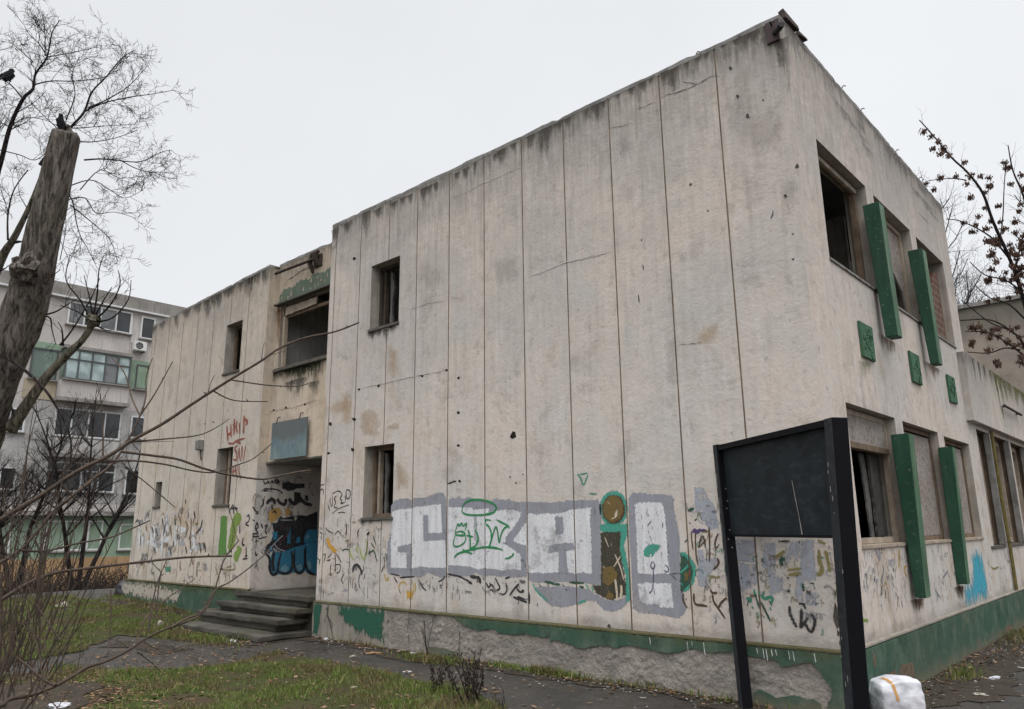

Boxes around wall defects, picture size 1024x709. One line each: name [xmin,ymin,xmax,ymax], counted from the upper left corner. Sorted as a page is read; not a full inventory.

water stain [585,52,708,117]
water stain [493,116,571,160]
water stain [273,361,321,391]
peeling [313,604,322,635]
spalling [337,601,738,700]
spalling [748,645,832,709]